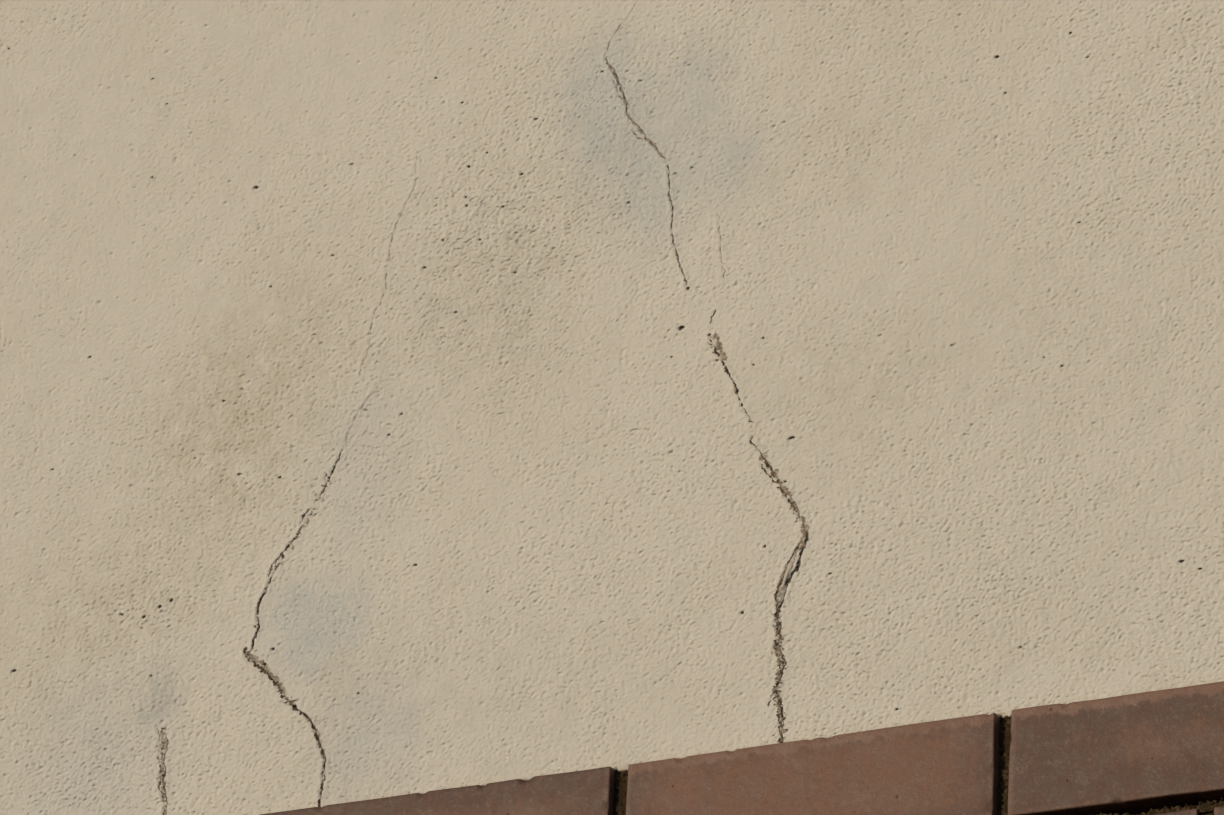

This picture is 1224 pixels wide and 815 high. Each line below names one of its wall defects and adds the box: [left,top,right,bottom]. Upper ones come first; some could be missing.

crack [605,0,690,290]
crack [243,156,417,807]
crack [708,310,809,743]
crack [156,727,168,815]